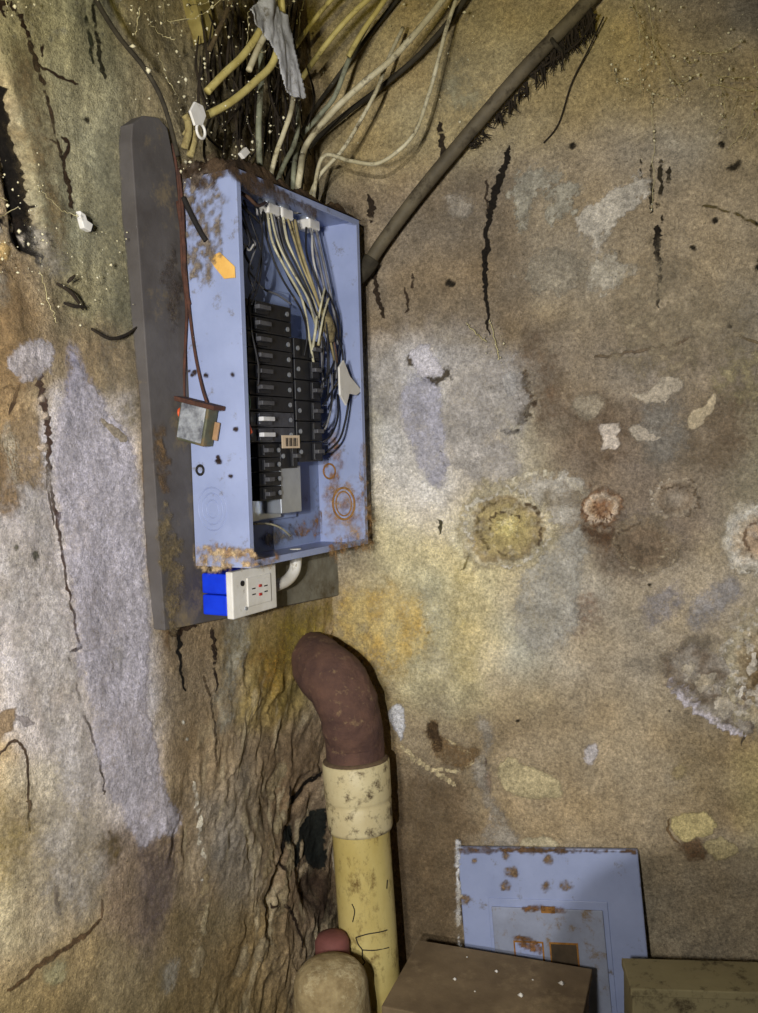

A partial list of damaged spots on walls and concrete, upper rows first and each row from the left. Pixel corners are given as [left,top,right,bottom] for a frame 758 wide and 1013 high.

crack [0,0,78,222]
crack [481,145,511,335]
crack [702,204,758,226]
peeling [7,339,55,383]
rust [580,485,624,542]
peeling [0,352,180,913]
damp [681,662,758,719]
damp [746,652,758,676]
crack [0,739,32,832]
spalling [273,801,291,834]
crack [7,899,104,992]
spalling [233,840,309,977]